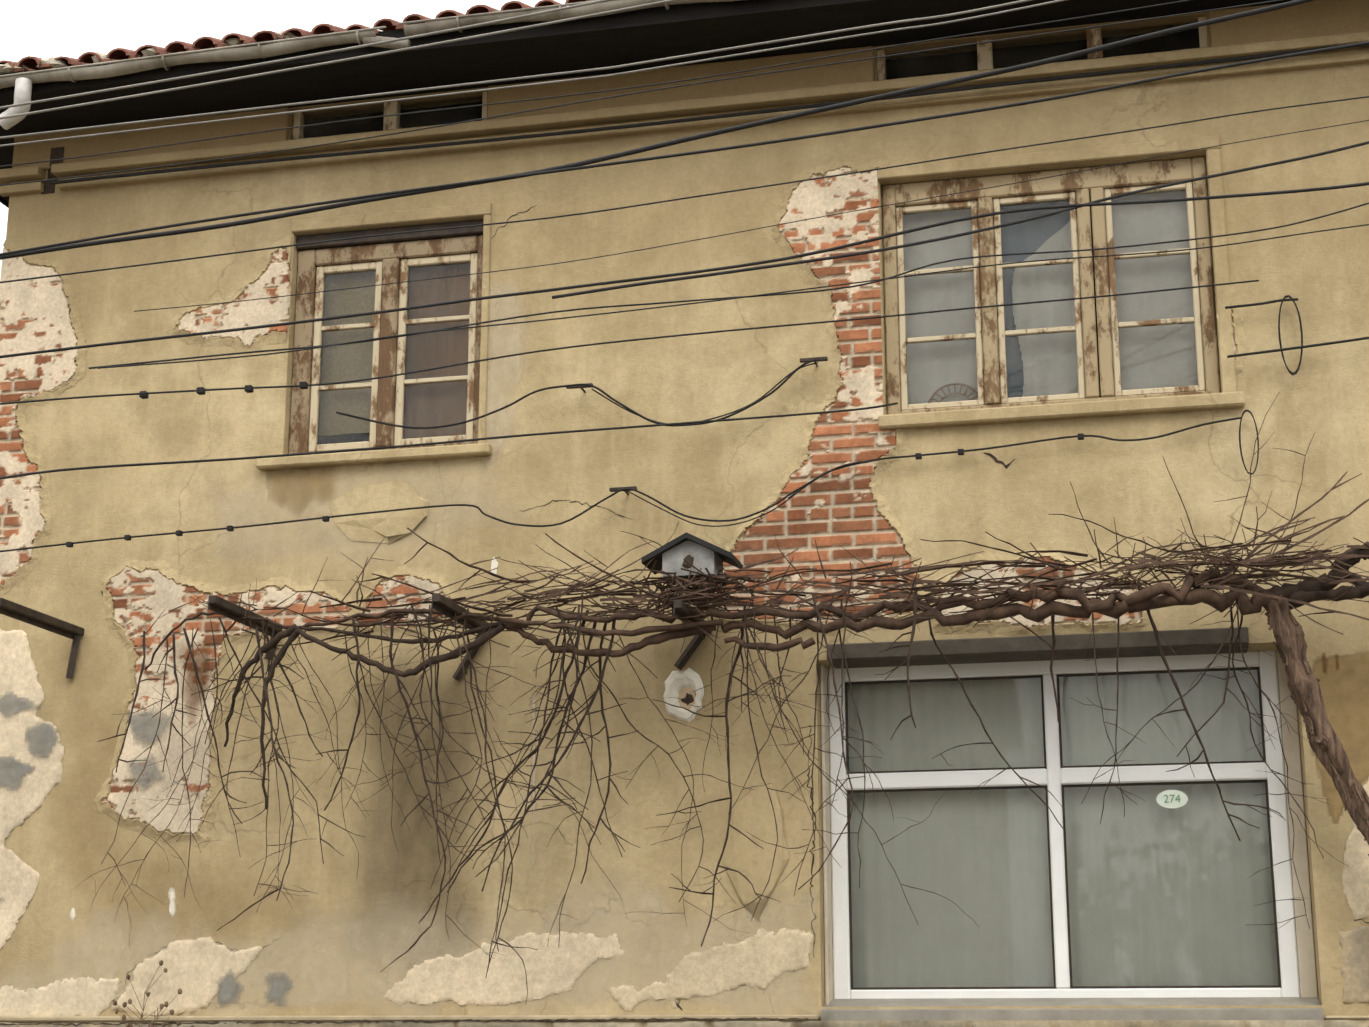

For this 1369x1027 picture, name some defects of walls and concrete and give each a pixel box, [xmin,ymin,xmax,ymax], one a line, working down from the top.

flaking render [166,236,292,358]
flaking render [0,240,88,595]
flaking render [709,158,1153,638]
flaking render [0,629,64,949]
flaking render [91,557,465,848]
flaking render [0,937,262,1016]
flaking render [168,887,176,917]
flaking render [384,931,627,1007]
flaking render [1339,820,1369,1004]